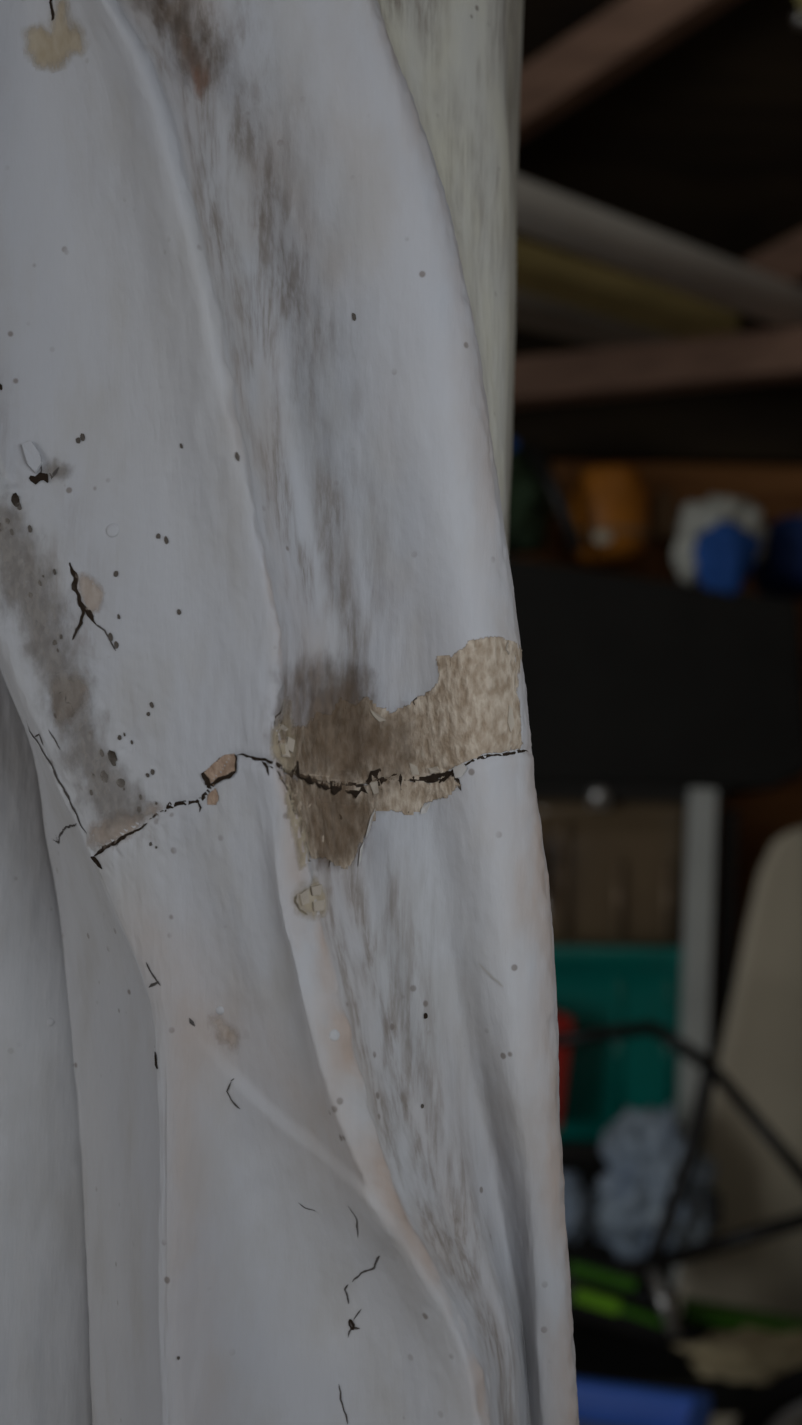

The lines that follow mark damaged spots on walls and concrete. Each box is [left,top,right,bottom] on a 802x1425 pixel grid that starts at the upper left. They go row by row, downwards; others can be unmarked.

damp [91,806,157,844]
crack [28,727,527,869]
peeling [270,636,523,869]
peeling [294,879,326,916]
crack [344,1208,380,1336]
crack [339,1386,348,1424]